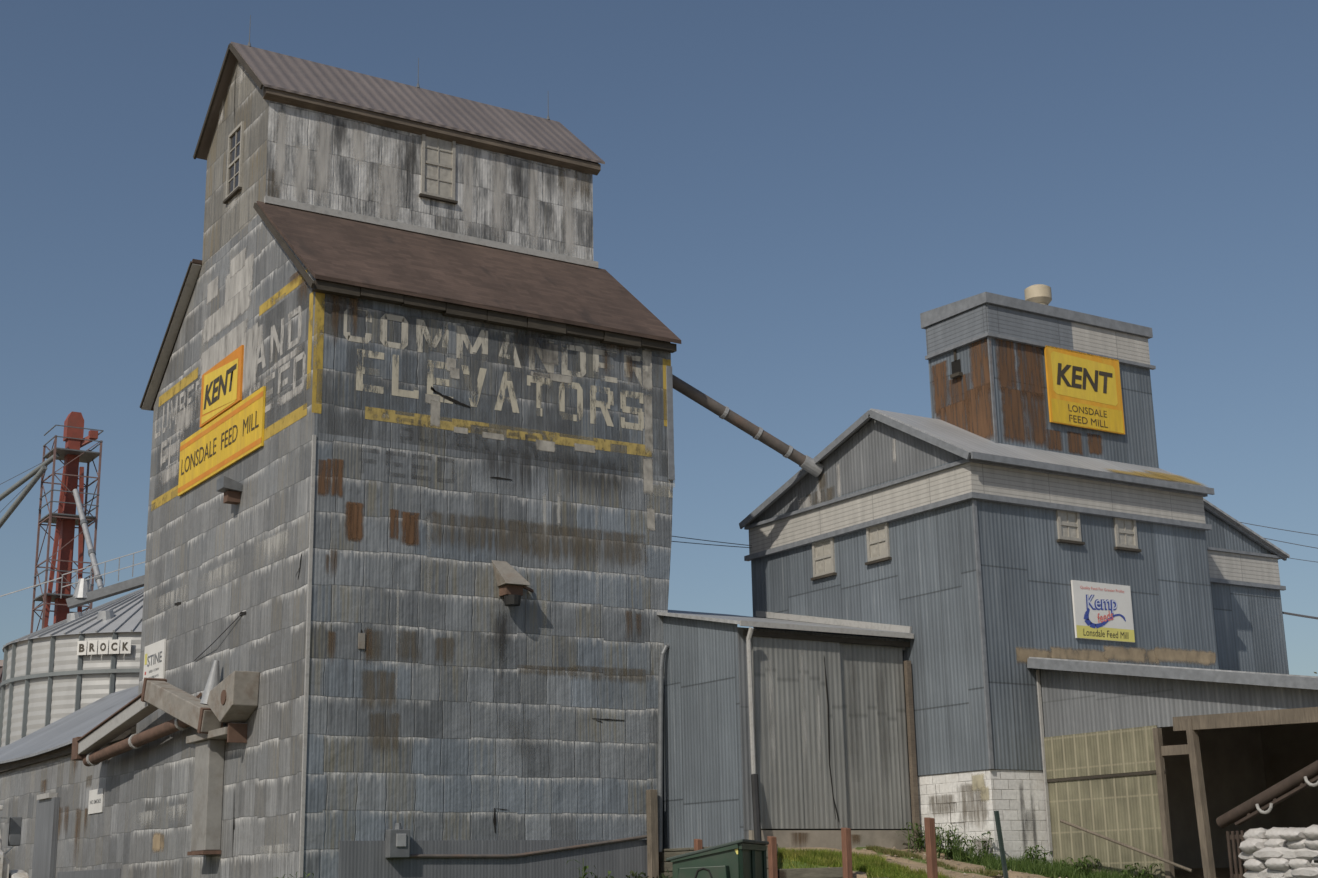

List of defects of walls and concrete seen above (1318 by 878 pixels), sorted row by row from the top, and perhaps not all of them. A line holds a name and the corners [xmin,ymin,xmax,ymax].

water stain [277,112,364,199]
water stain [494,153,574,248]
rust [932,338,1102,454]
rust [318,459,363,540]
rust [390,509,419,545]
water stain [428,496,635,560]
crack [824,657,839,821]